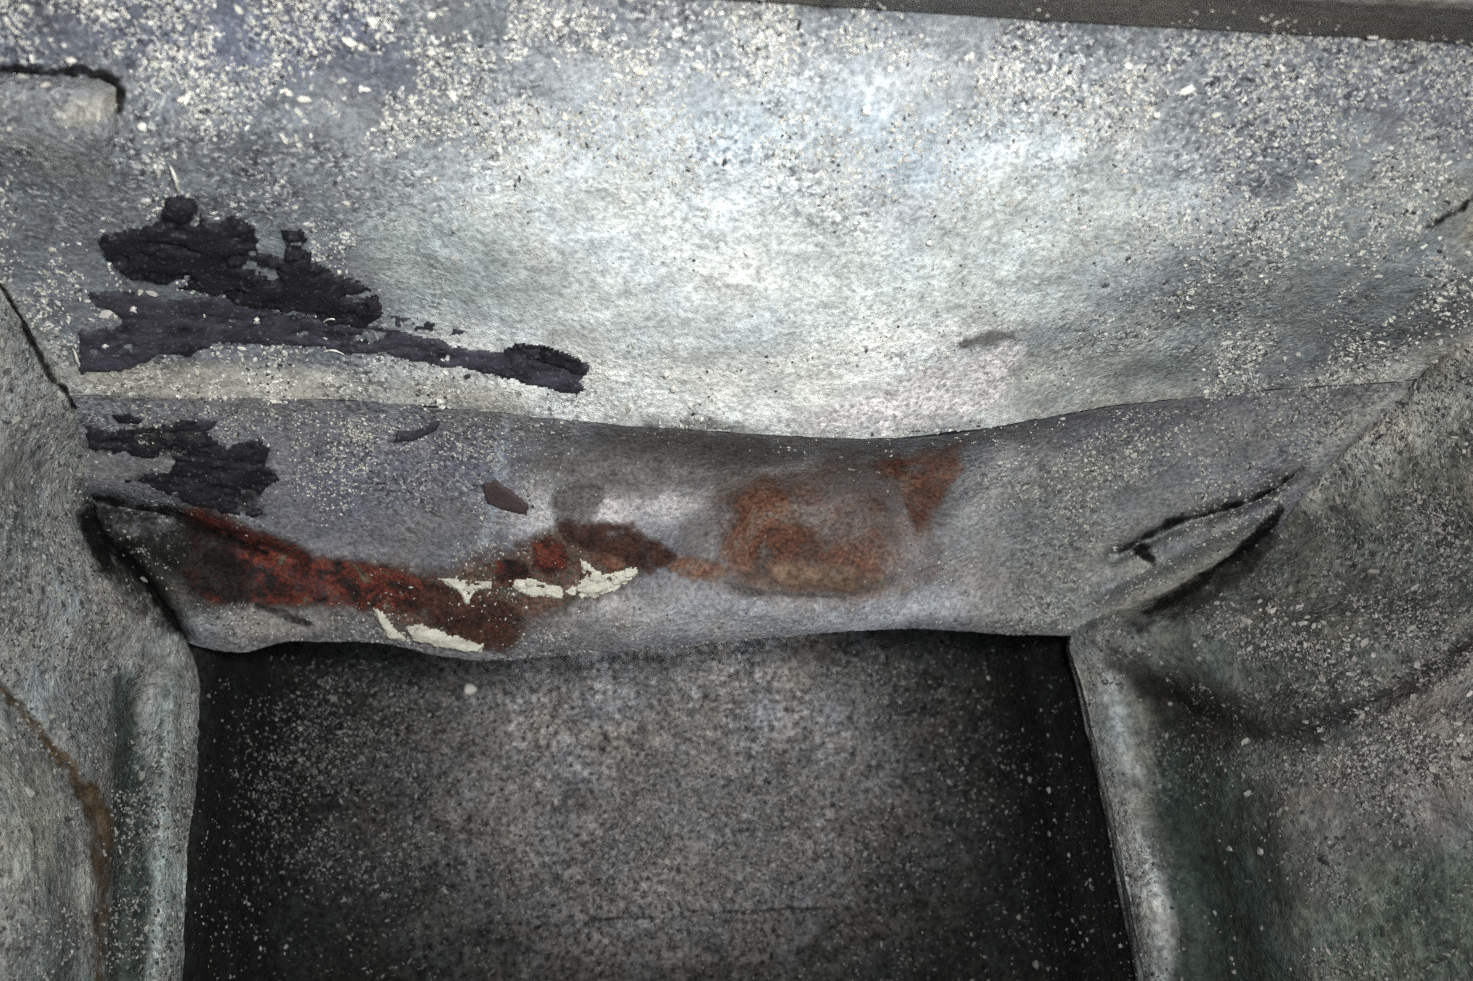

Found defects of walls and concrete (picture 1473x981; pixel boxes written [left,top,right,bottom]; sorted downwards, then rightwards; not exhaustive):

crack [0,63,126,113]
crack [1427,199,1473,228]
peeling [78,195,589,395]
peeling [394,420,440,442]
peeling [81,414,280,517]
peeling [483,480,529,515]
rust [182,447,962,651]
crack [1119,472,1296,614]
peeling [438,558,639,605]
peeling [373,608,484,652]
rust [0,685,114,981]